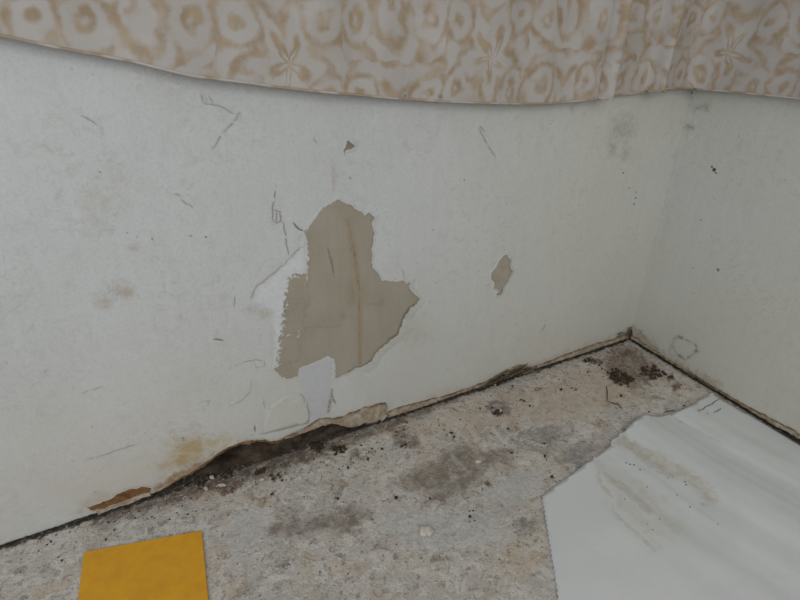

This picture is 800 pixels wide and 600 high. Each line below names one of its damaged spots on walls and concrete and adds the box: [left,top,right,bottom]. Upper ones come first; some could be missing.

peeling [250,197,425,382]
peeling [489,252,515,298]
flaking render [163,334,800,489]
flaking render [95,492,151,514]